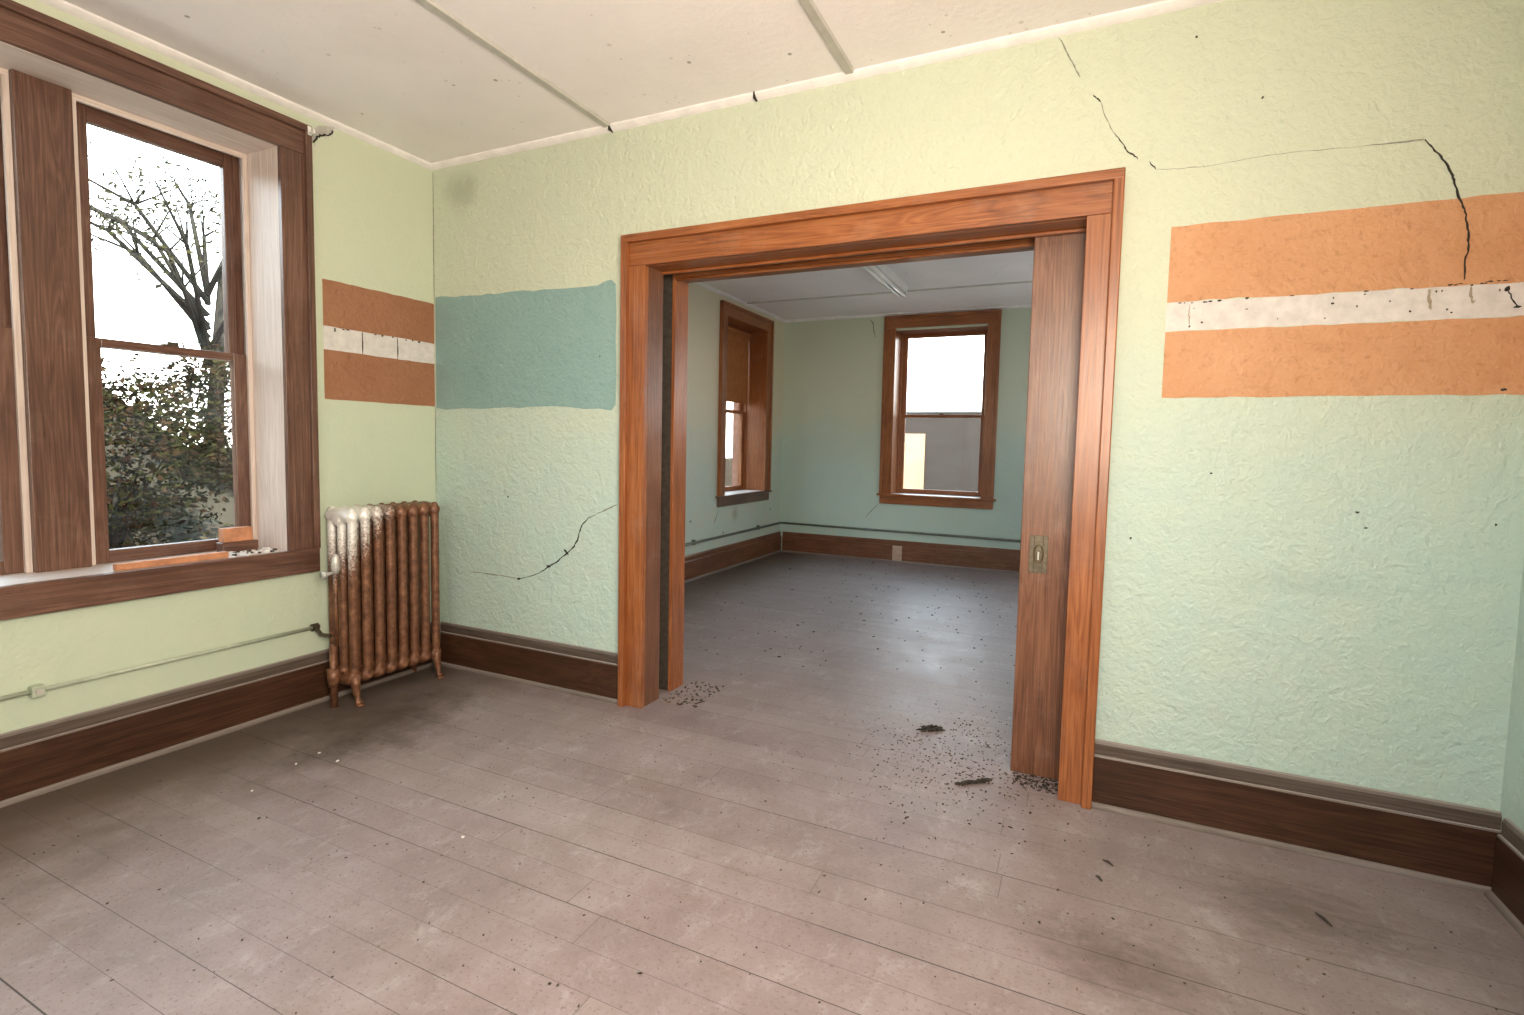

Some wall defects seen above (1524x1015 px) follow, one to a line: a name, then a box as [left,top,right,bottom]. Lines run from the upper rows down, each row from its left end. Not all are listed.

crack [1058,37,1470,279]
crack [469,505,616,580]